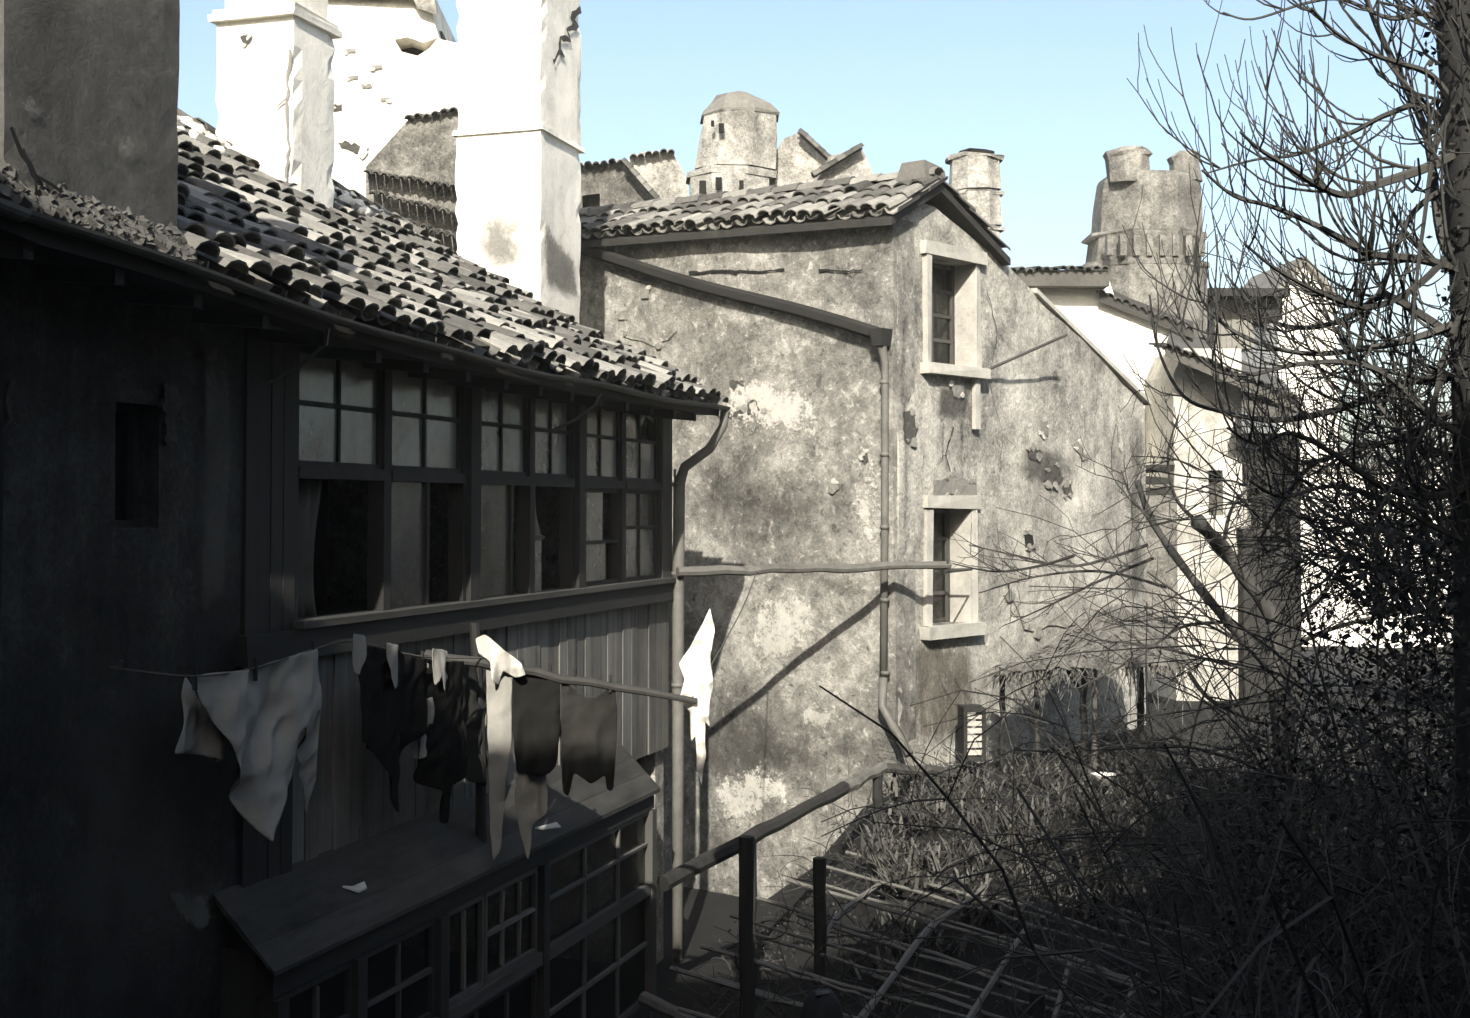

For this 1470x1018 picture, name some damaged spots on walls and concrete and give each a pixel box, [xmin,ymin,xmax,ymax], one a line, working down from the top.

spalling [346,64,392,104]
spalling [337,137,369,160]
spalling [947,380,965,398]
spalling [1026,421,1073,499]